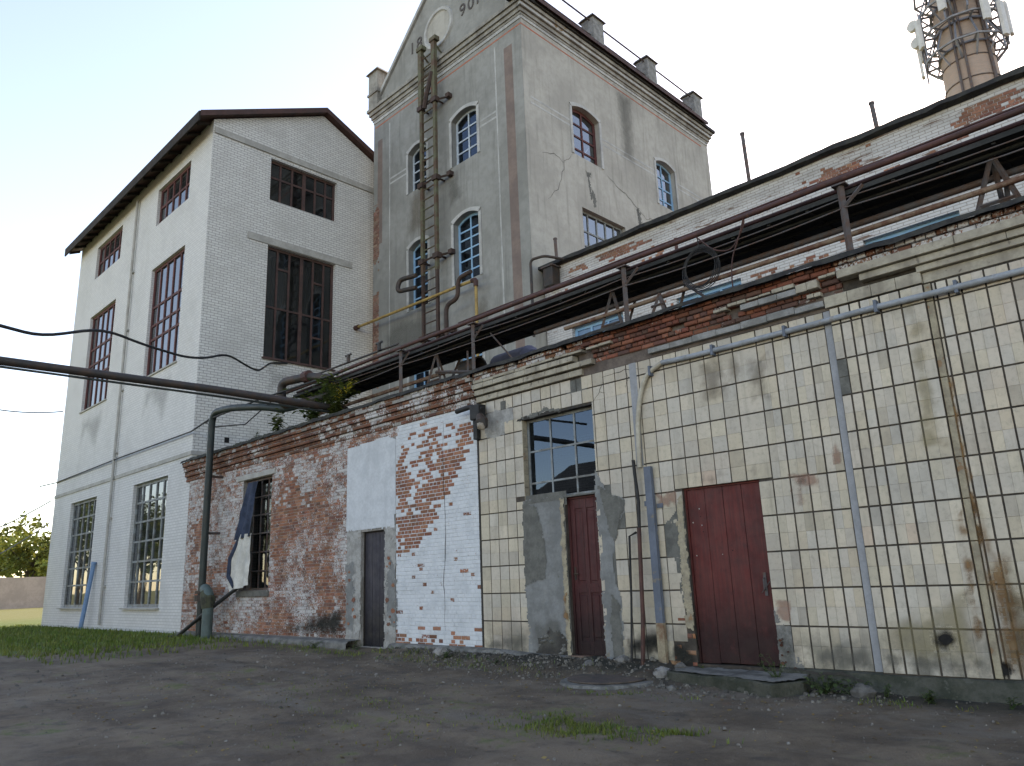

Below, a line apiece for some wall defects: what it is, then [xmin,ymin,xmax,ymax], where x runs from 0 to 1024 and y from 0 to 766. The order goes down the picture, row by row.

peeling [950,88,1024,141]
crack [609,178,653,224]
corrosion [939,372,967,473]
peeling [272,439,350,517]
peeling [183,468,256,634]
spalling [330,530,362,645]
peeling [383,422,482,656]
corrosion [961,492,1024,669]
spalling [536,627,568,655]